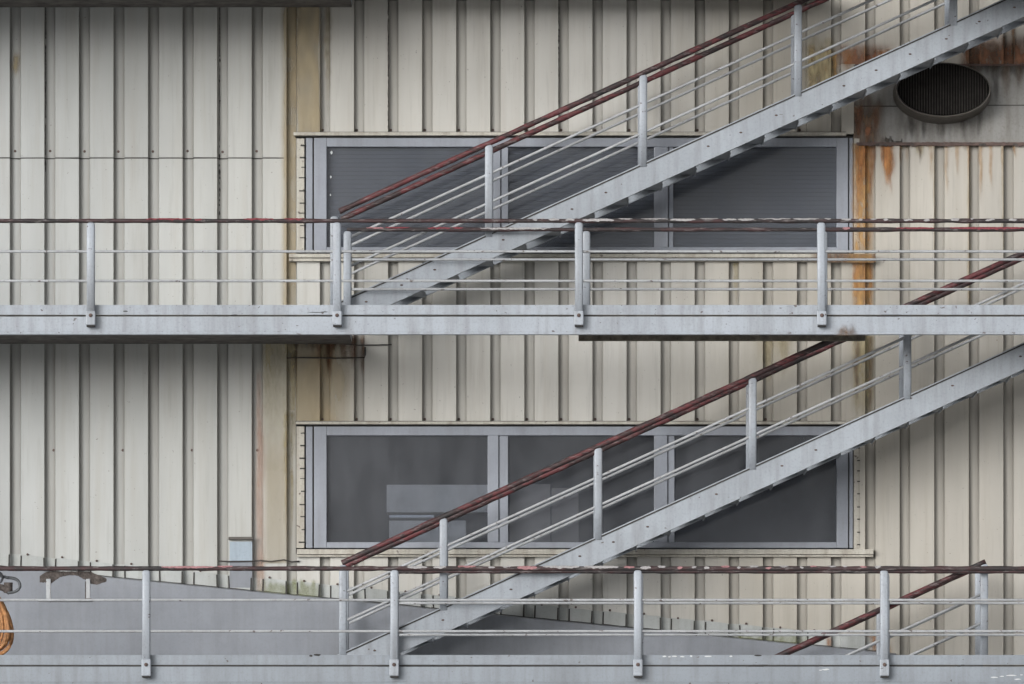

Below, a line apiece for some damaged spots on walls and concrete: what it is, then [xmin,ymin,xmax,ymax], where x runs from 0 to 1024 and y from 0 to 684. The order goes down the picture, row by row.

rust [843,48,889,64]
rust [963,29,1024,64]
rust [816,97,1024,305]